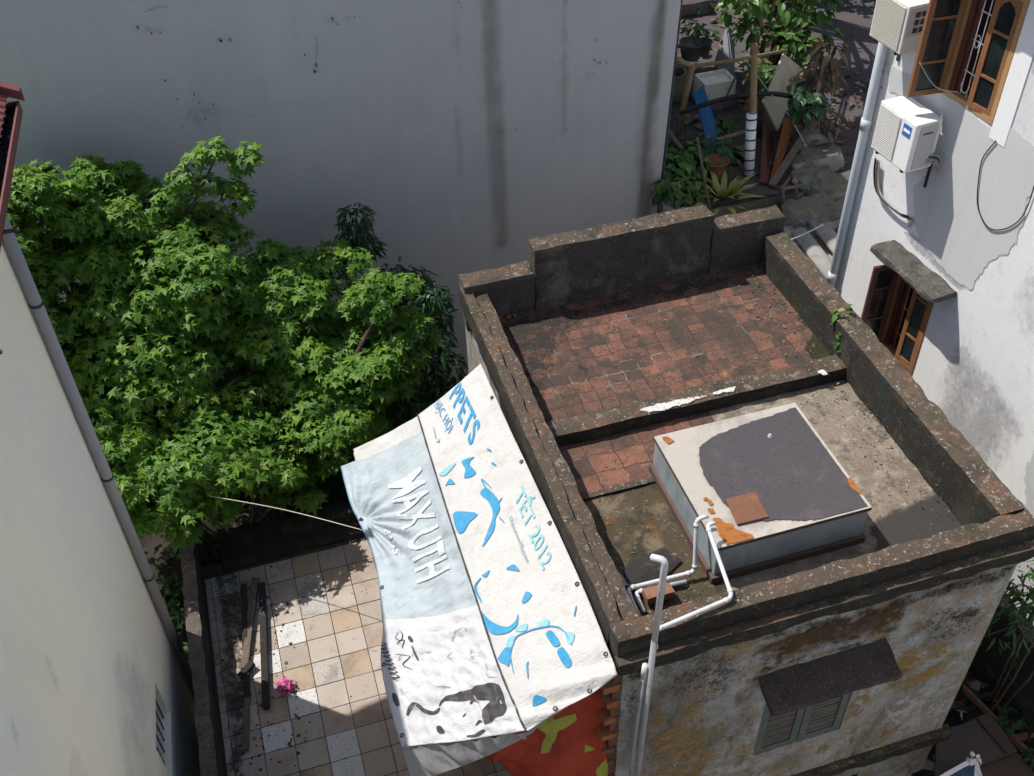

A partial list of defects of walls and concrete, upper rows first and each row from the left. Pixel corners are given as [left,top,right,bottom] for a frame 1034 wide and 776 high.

damp [640,56,659,217]
peeling [885,61,1034,290]
damp [946,355,1014,460]
peeling [1024,451,1034,517]
damp [871,494,962,551]
damp [774,567,1014,639]
peeling [1005,557,1034,626]
damp [661,643,774,702]